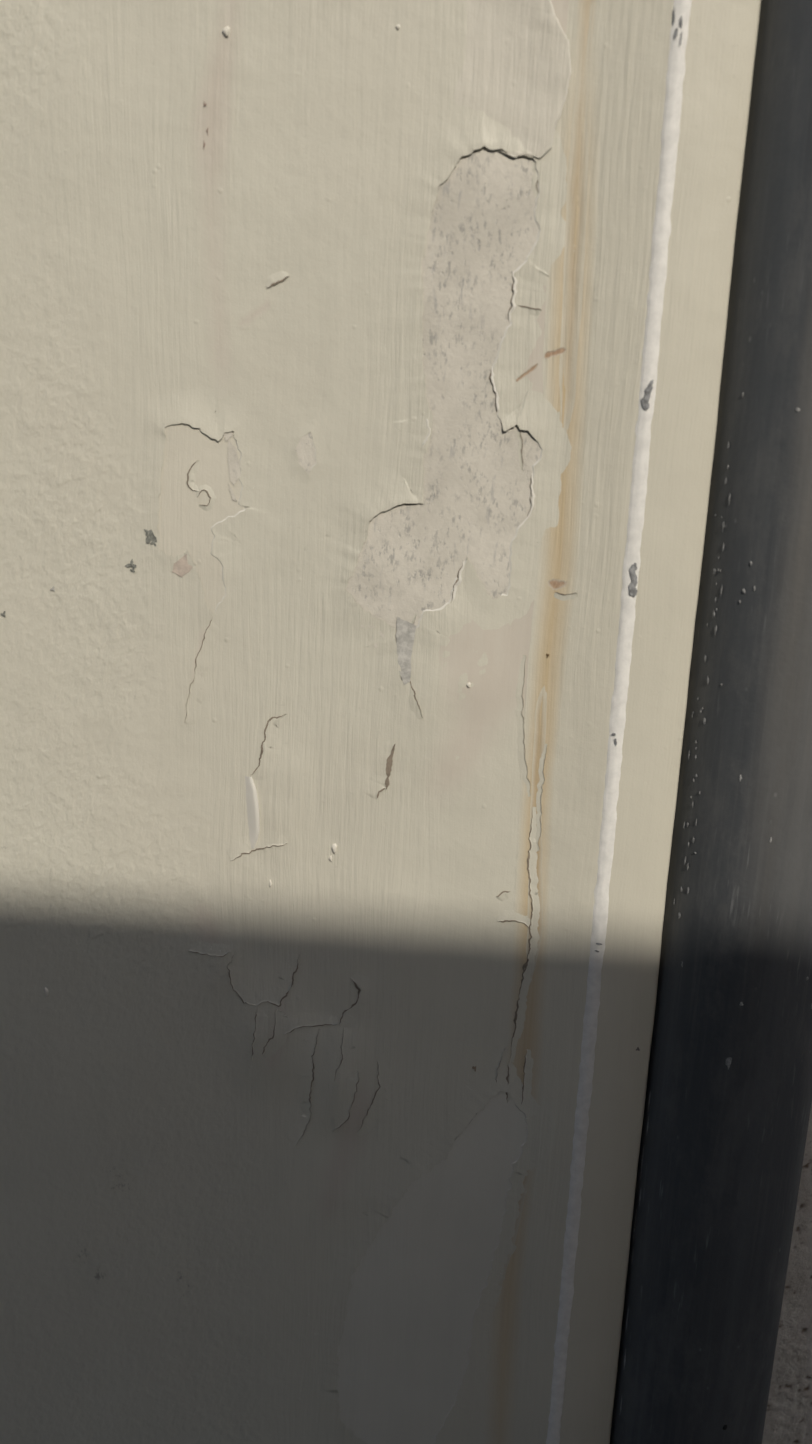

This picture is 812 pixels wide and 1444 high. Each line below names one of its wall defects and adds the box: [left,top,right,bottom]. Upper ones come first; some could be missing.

peeling [306,0,575,723]
peeling [125,388,275,641]
peeling [226,714,290,861]